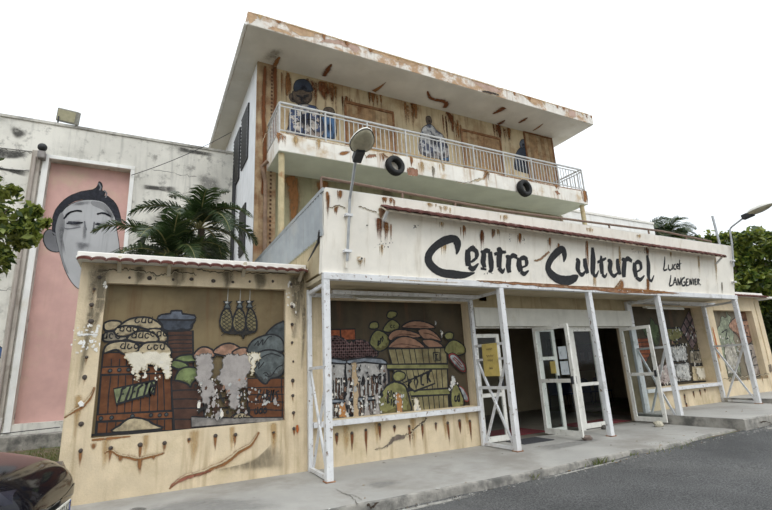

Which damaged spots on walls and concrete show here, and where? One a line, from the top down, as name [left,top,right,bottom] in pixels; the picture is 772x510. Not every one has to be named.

corrosion [261,57,299,244]